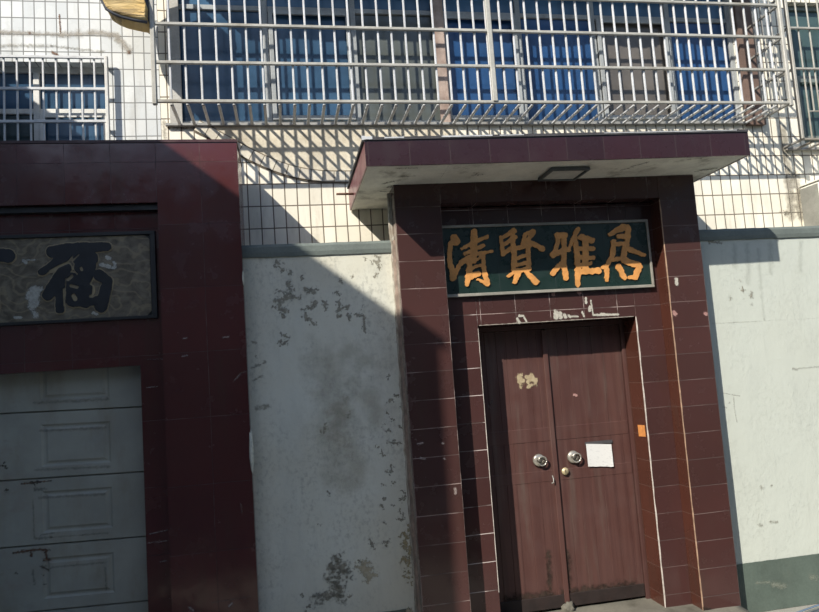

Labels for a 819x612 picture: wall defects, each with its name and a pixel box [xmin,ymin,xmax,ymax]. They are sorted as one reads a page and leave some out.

peeling [25,285,44,318]
peeling [272,260,366,334]
spalling [553,291,619,319]
peeling [380,464,413,586]
flaking render [300,553,378,612]